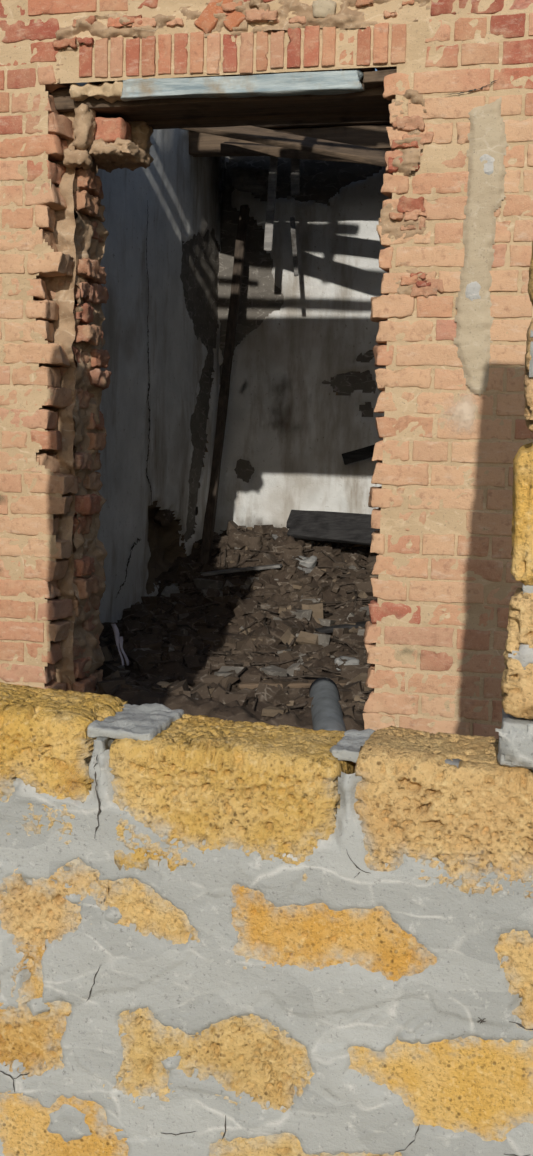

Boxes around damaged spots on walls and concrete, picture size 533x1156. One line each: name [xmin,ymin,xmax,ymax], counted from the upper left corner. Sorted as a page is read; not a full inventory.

spalling [52,0,431,83]
spalling [394,268,444,297]
crack [145,200,153,506]
flaking render [146,89,434,595]
crack [116,538,142,598]
crack [93,755,101,839]